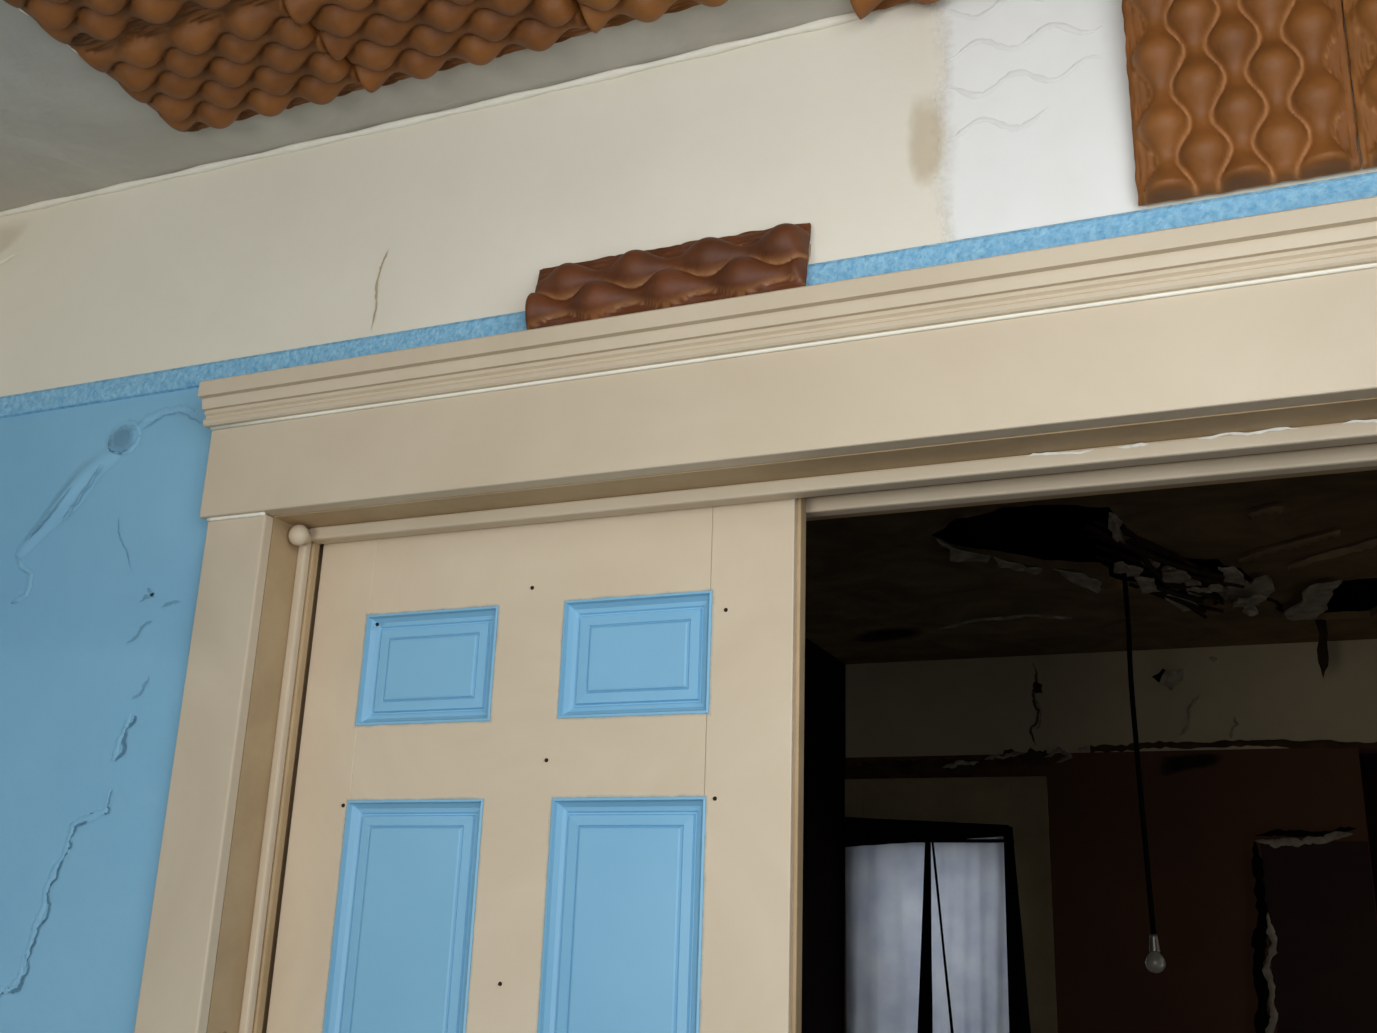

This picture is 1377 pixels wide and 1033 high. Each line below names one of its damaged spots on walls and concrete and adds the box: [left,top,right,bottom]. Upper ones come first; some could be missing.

crack [117,524,180,643]
crack [0,677,149,997]
peeling [1251,827,1377,1033]